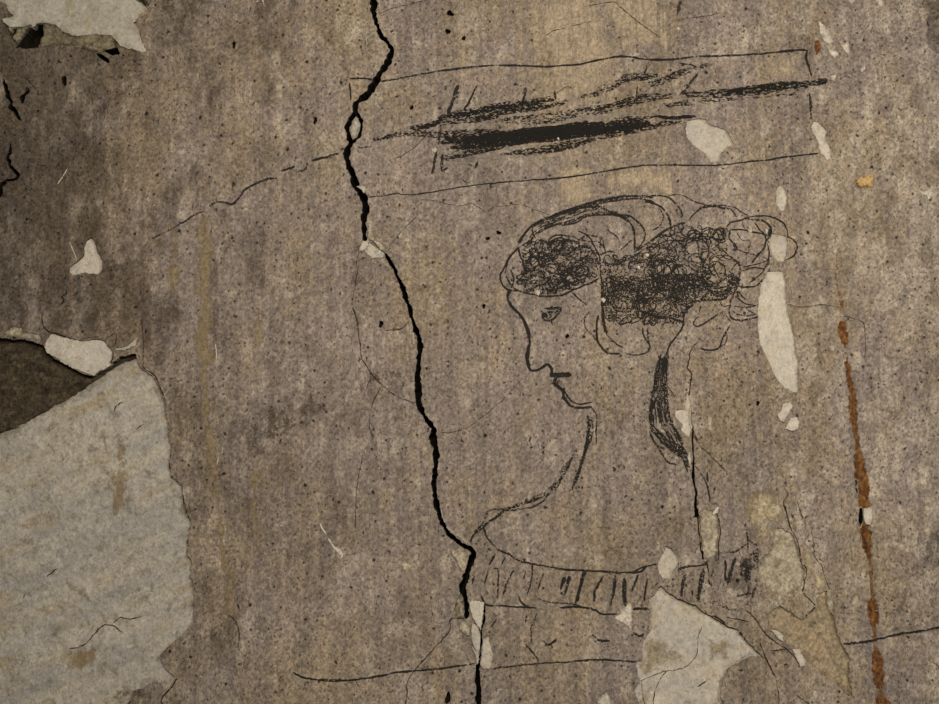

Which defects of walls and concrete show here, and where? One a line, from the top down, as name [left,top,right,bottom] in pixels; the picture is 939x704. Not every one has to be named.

flaking render [0,0,151,64]
flaking render [686,119,733,162]
flaking render [70,238,103,275]
crack [339,0,550,704]
flaking render [758,234,799,431]
flaking render [0,327,195,704]
rust [837,321,891,704]
flaking render [635,546,763,704]